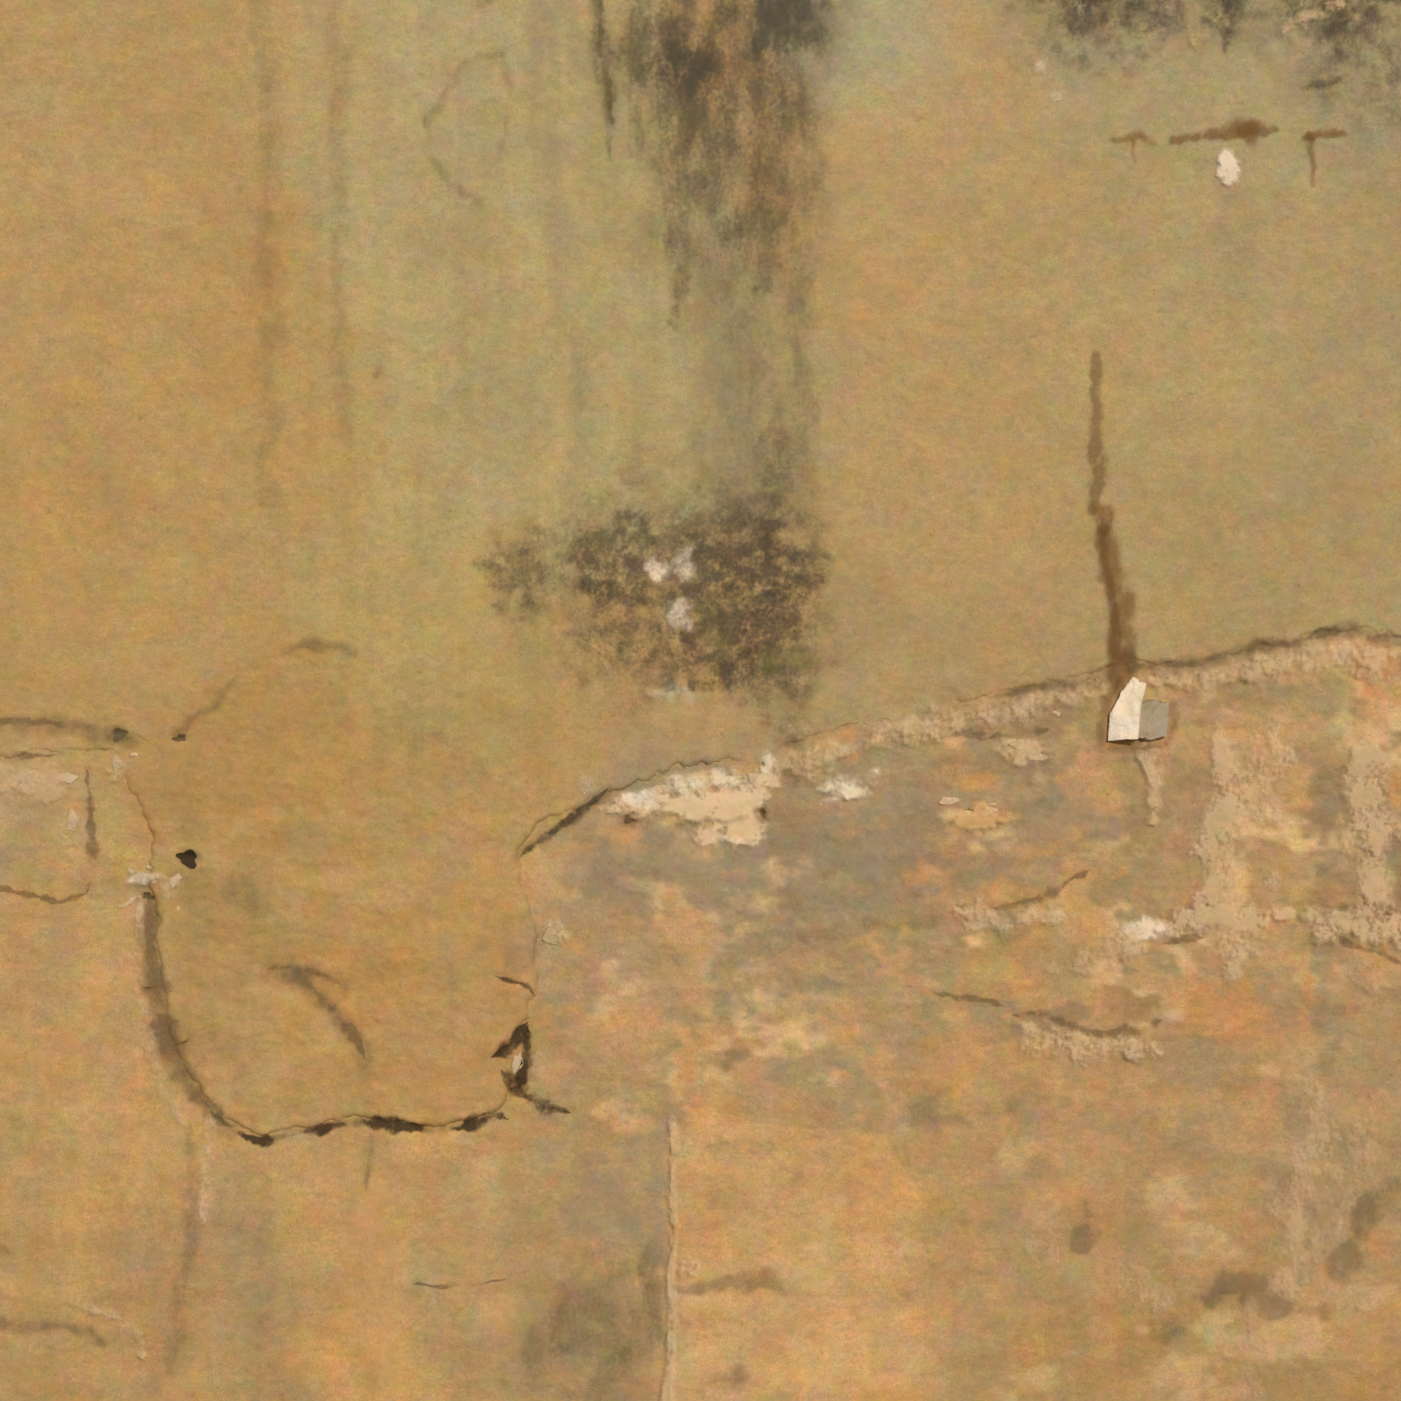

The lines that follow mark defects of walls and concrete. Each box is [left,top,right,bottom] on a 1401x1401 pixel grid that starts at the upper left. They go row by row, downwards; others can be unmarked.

damp [1283,11,1323,33]
corrosion [1217,149,1240,185]
damp [645,561,692,582]
damp [670,599,687,623]
crack [523,788,608,854]
peeling [0,627,1401,1401]
crack [210,977,570,1147]